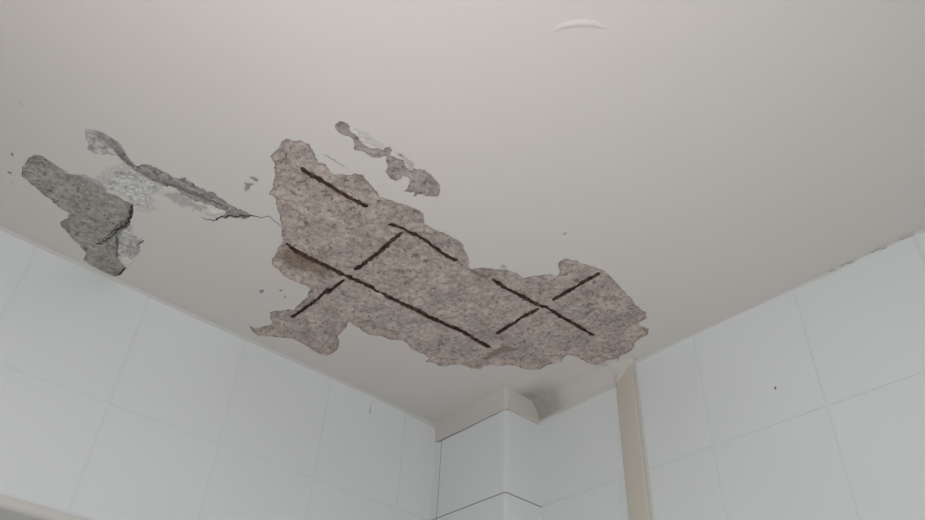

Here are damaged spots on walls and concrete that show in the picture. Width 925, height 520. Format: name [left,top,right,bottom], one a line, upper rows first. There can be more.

spalling [8,155,161,276]
crack [85,129,278,224]
spalling [335,121,440,197]
spalling [250,139,649,370]